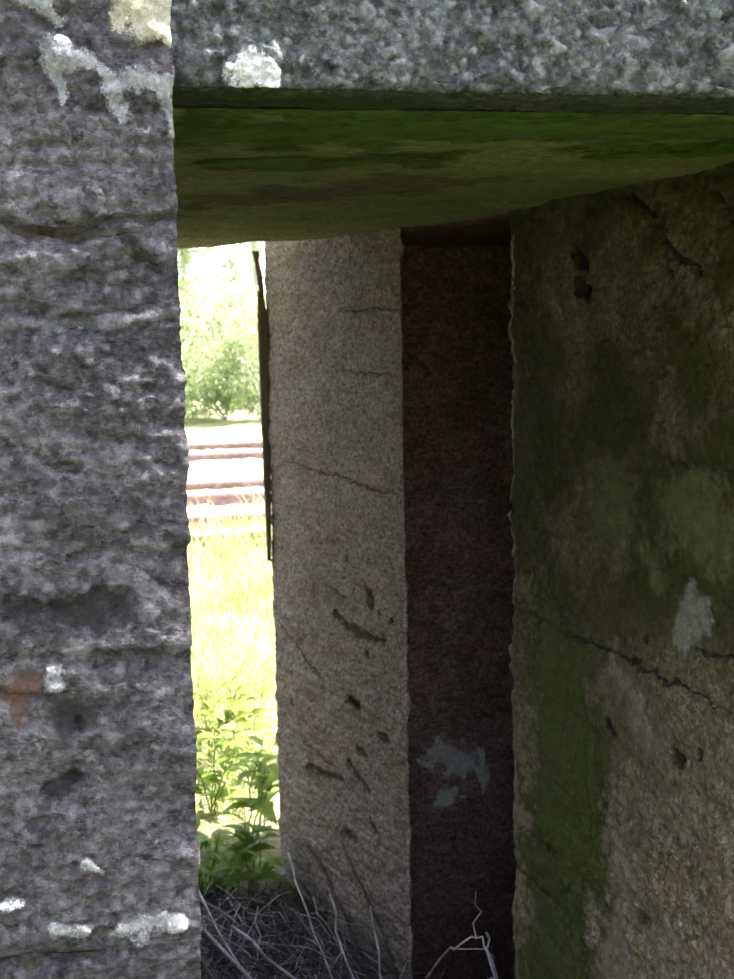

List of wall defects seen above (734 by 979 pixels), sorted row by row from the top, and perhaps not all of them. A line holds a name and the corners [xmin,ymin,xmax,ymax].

water stain [18,0,175,138]
crack [291,462,397,495]
crack [520,609,724,709]
crack [688,646,734,659]